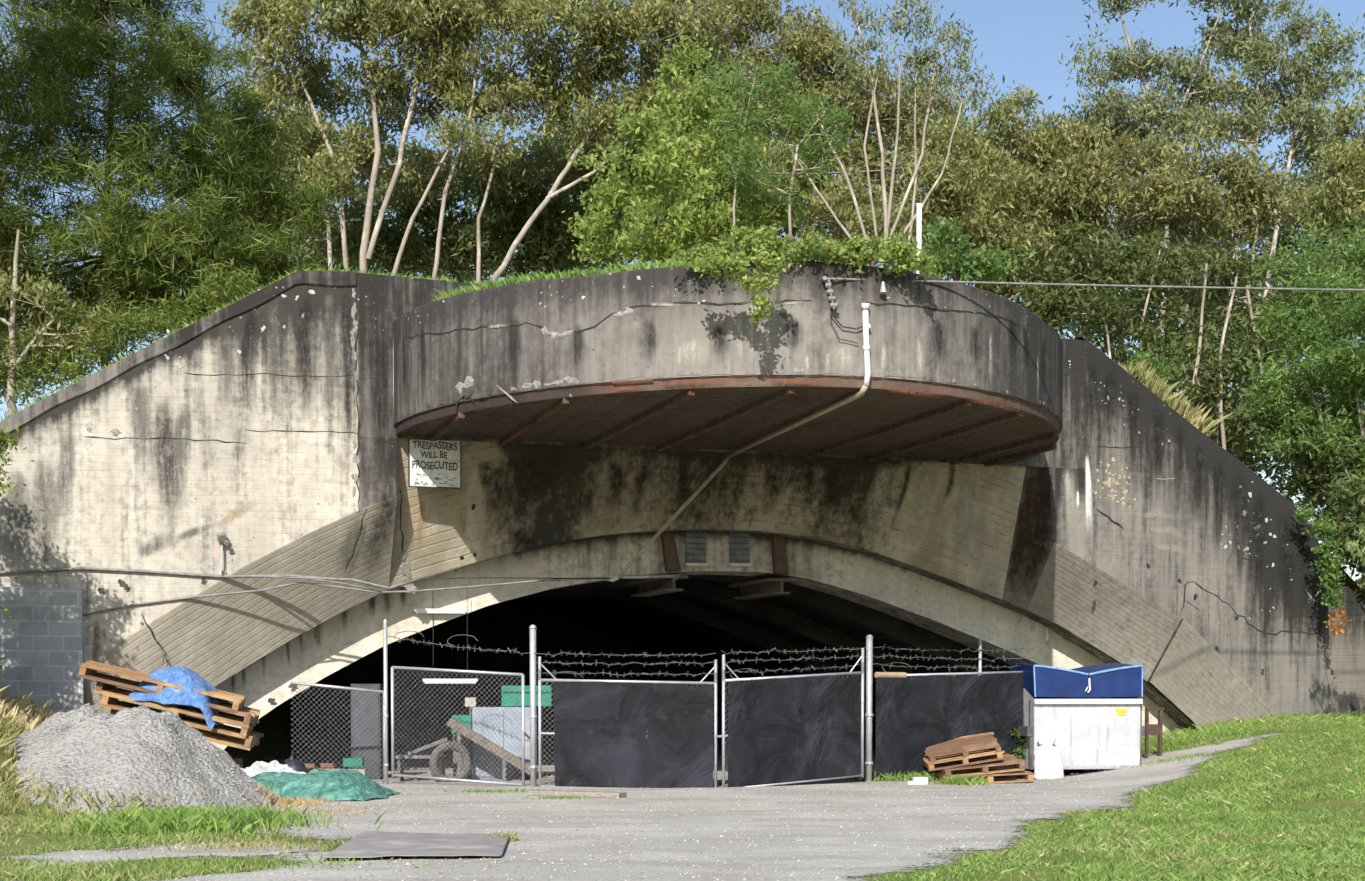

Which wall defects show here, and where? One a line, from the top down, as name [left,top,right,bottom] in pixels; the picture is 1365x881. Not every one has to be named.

crack [406,299,811,340]
crack [867,302,1021,326]
corrosion [612,379,710,390]
leakage [134,390,188,499]
leakage [8,435,71,551]
leakage [610,464,647,504]
leakage [868,467,973,537]
leakage [1010,458,1091,577]
crack [142,615,171,666]
crack [1179,581,1356,713]